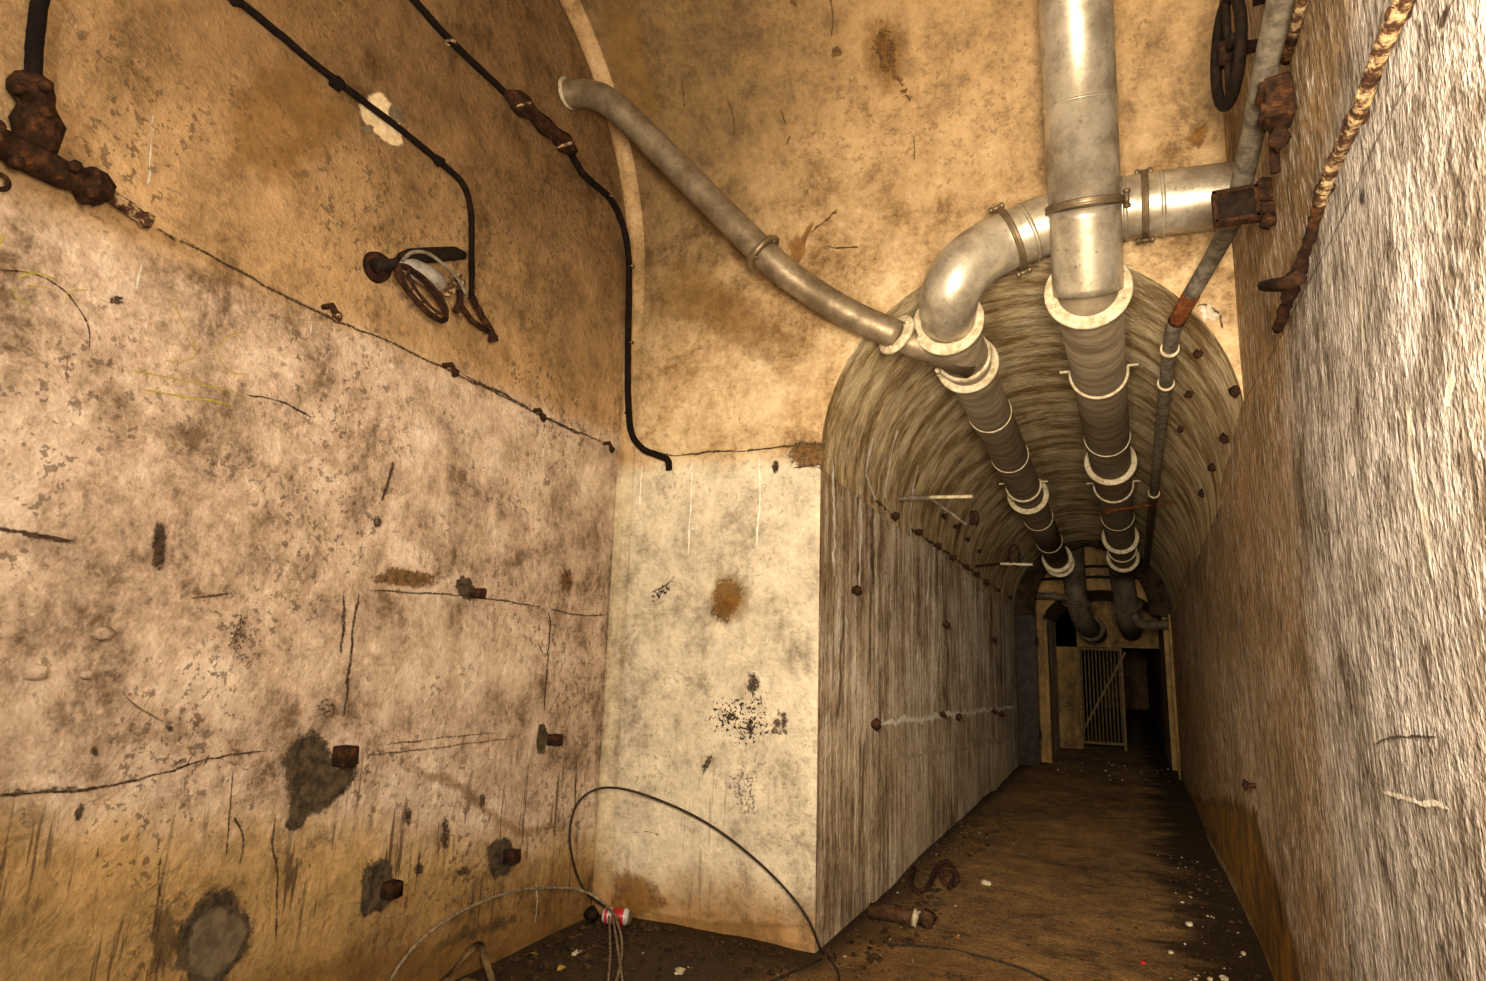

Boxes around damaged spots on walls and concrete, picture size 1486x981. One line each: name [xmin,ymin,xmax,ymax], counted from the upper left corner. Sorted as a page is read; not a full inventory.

crack [157,229,601,442]
crack [0,527,74,543]
rust [711,579,742,623]
water stain [709,673,787,746]
water stain [281,699,357,831]
crack [0,751,279,941]
water stain [360,859,393,916]
water stain [487,837,513,877]
water stain [152,888,252,981]